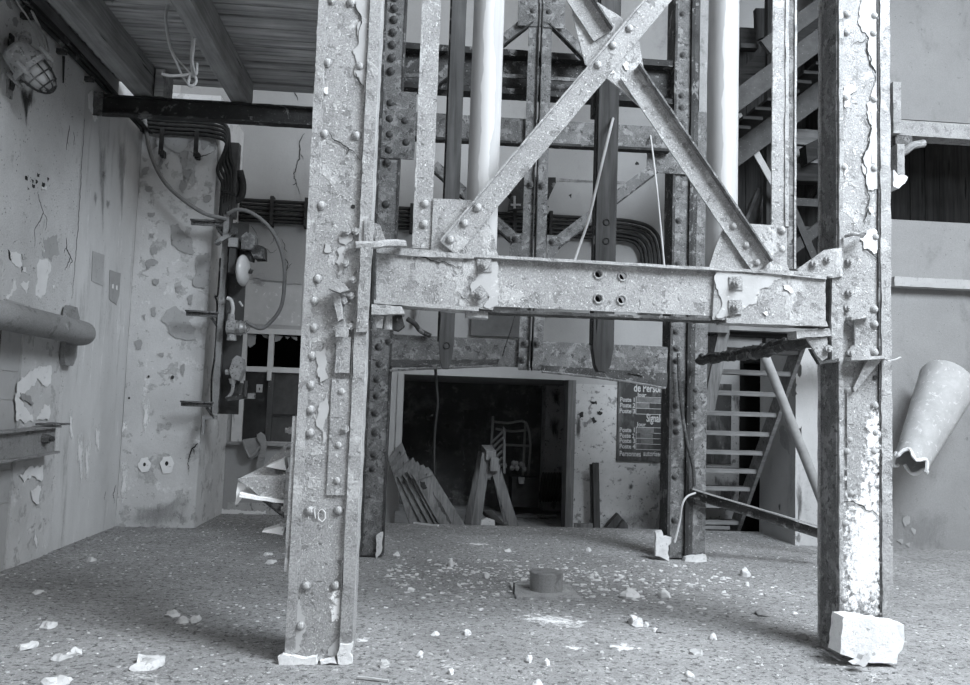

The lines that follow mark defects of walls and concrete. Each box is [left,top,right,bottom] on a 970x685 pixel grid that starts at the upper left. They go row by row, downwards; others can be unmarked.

peeling [843,84,856,108]
peeling [858,0,880,191]
peeling [142,130,217,193]
crack [293,133,305,193]
peeling [142,224,211,340]
peeling [324,233,353,275]
peeling [714,271,794,318]
peeling [15,365,52,423]
peeling [19,465,43,505]